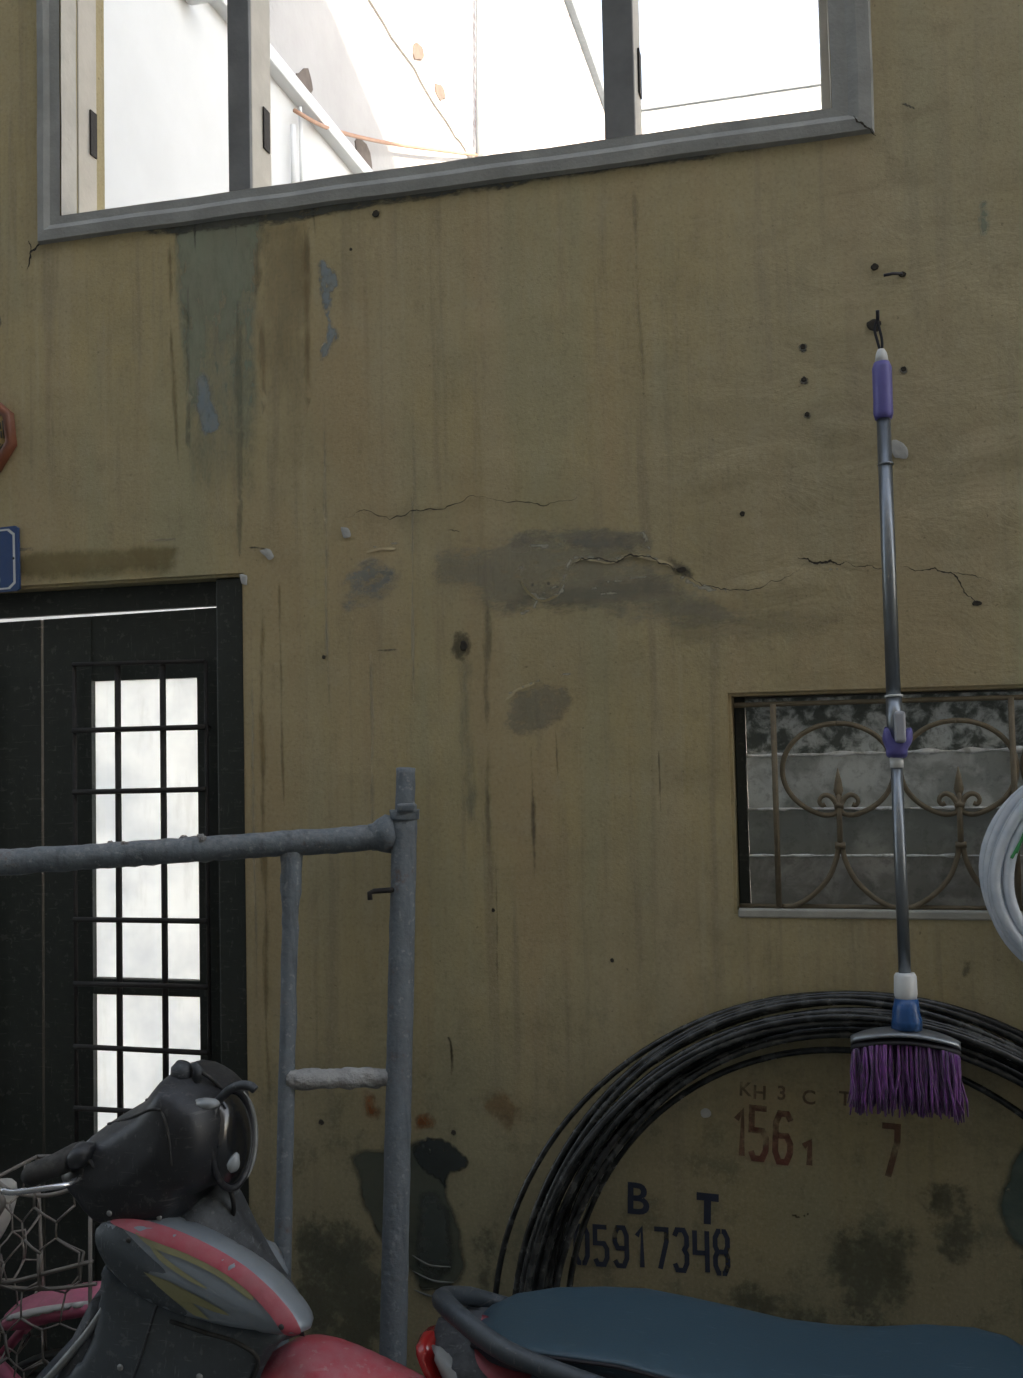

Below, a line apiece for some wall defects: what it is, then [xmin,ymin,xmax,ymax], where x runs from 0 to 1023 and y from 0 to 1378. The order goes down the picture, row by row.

leakage [171,217,260,431]
crack [572,554,986,606]